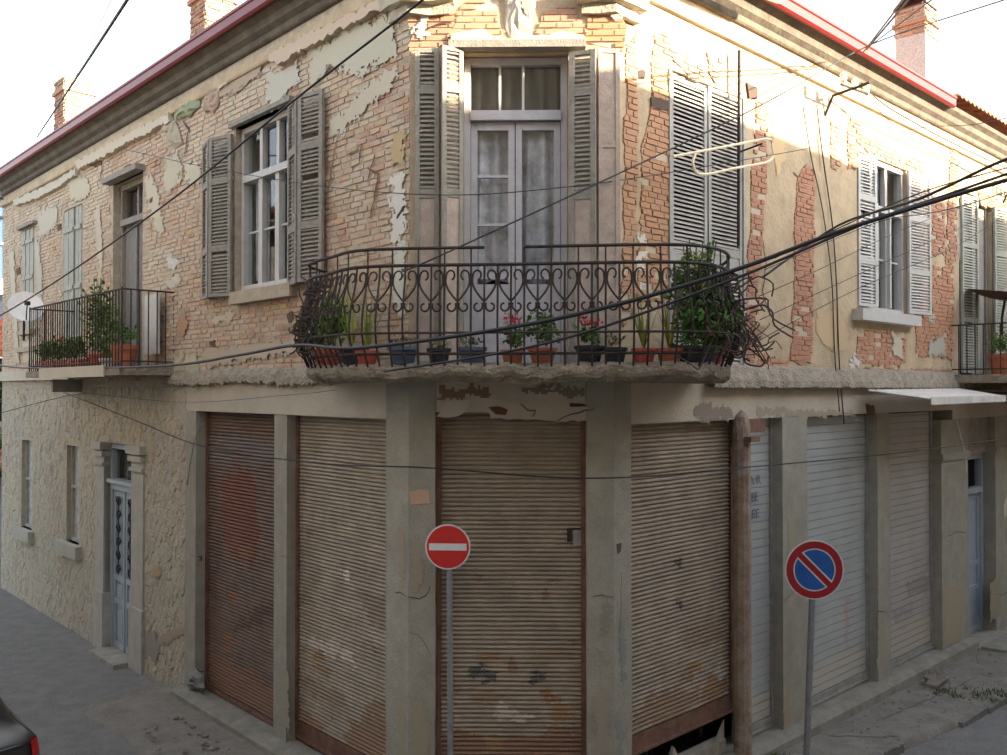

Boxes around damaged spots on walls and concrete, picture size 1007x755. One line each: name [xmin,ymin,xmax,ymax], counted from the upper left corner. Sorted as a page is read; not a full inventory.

spalling [830,116,925,175]
spalling [746,101,816,367]
spalling [855,149,959,372]
spalling [978,191,1007,226]
crack [520,404,594,421]
corrosion [220,449,262,571]
corrosion [208,652,273,719]
corrosion [441,688,581,755]